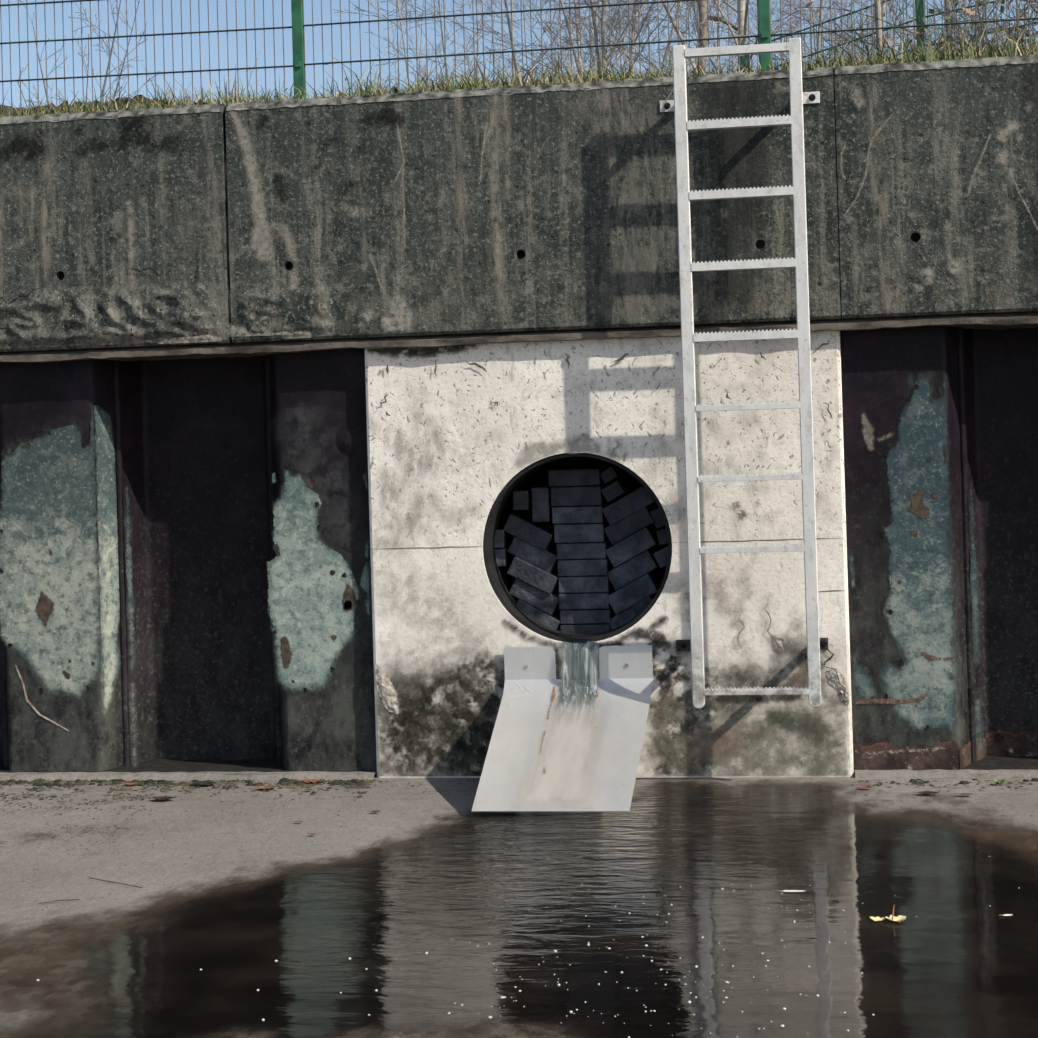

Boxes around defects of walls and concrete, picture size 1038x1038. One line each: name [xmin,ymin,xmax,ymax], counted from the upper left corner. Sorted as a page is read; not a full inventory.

leakage [230,111,299,290]
leakage [490,95,510,311]
leakage [707,80,765,302]
leakage [228,308,303,337]
leakage [364,295,411,331]
peeling [0,405,134,713]
peeling [267,459,370,692]
leakage [377,578,505,776]
leakage [0,638,1038,1038]
peeling [826,376,956,733]
corrosion [854,730,1038,770]
peeling [970,488,980,662]